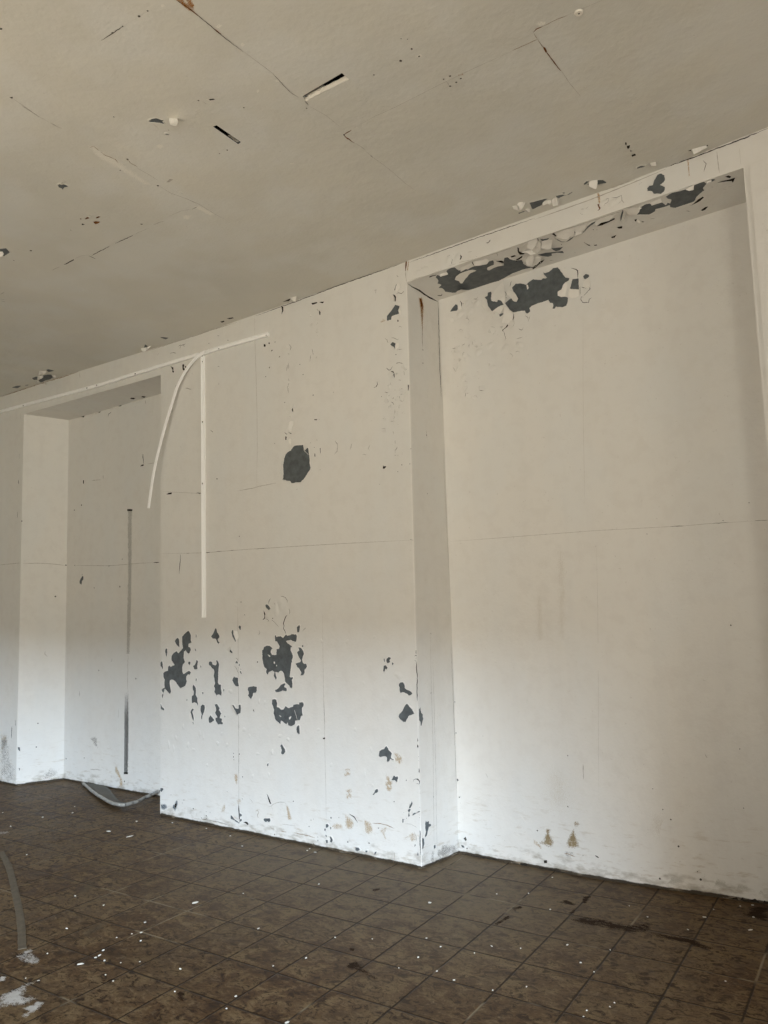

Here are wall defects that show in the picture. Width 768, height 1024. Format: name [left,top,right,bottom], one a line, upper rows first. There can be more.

peeling [430,142,735,331]
peeling [160,614,258,726]
peeling [257,617,308,734]
peeling [378,745,395,763]
peeling [398,681,424,726]